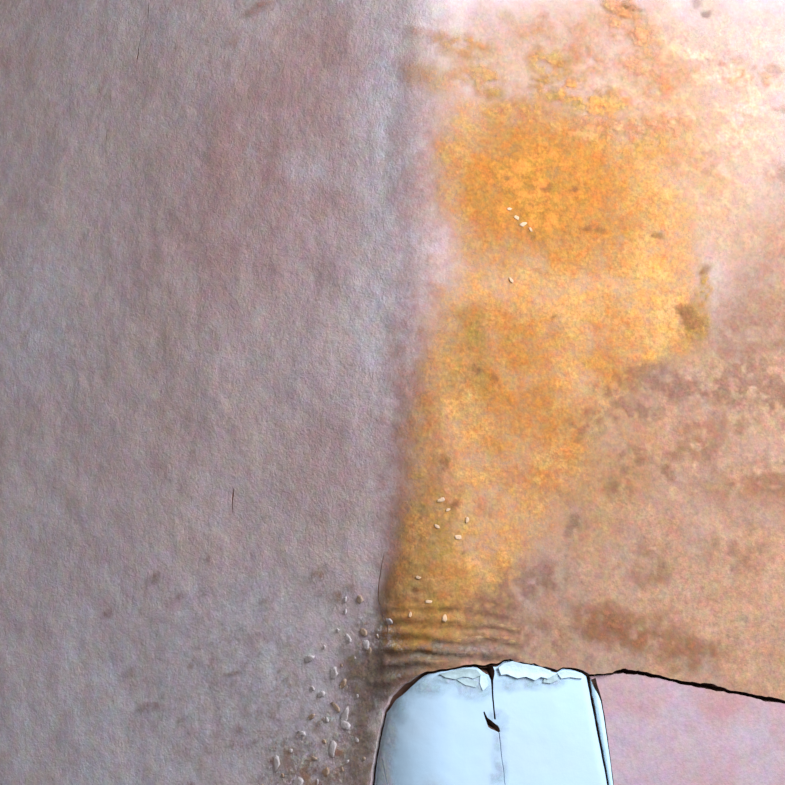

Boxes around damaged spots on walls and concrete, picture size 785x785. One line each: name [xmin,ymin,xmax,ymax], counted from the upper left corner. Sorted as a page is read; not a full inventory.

rust [388,0,785,653]
peeling [253,595,583,785]
crack [373,659,785,785]